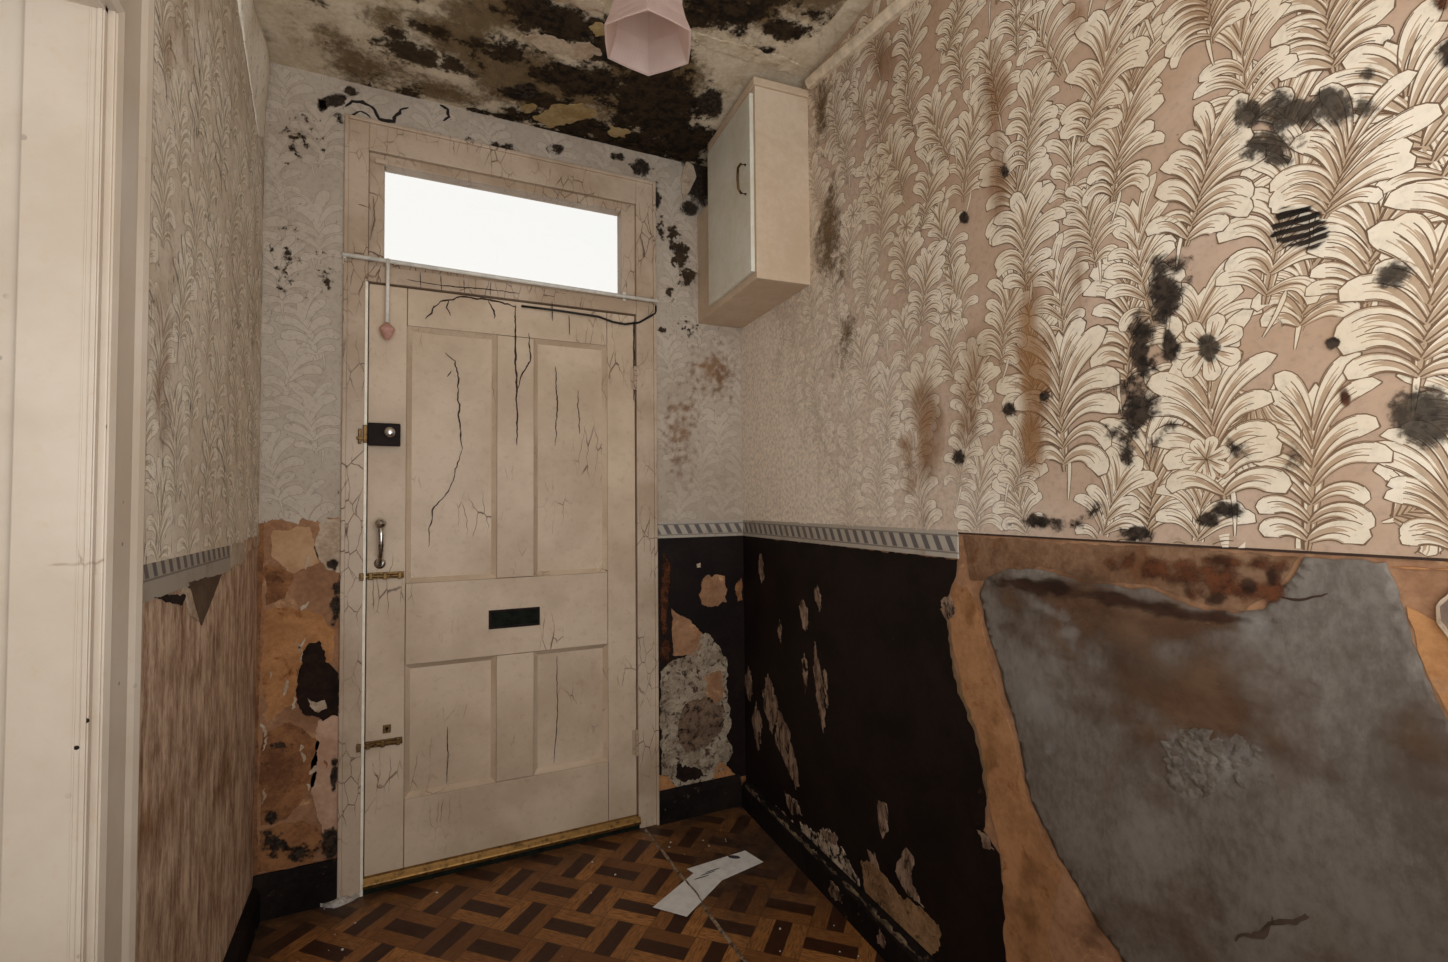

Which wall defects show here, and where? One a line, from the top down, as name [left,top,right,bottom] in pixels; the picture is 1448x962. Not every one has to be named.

water stain [279,0,846,300]
water stain [1270,206,1330,250]
water stain [1234,86,1379,167]
water stain [1105,255,1221,466]
water stain [1389,385,1448,450]
flaking render [257,517,341,874]
flaking render [659,609,735,791]
flaking render [696,563,743,607]
peeling [745,667,942,956]
peeling [941,584,1062,962]
water stain [1196,501,1243,527]
peeling [1407,607,1448,712]